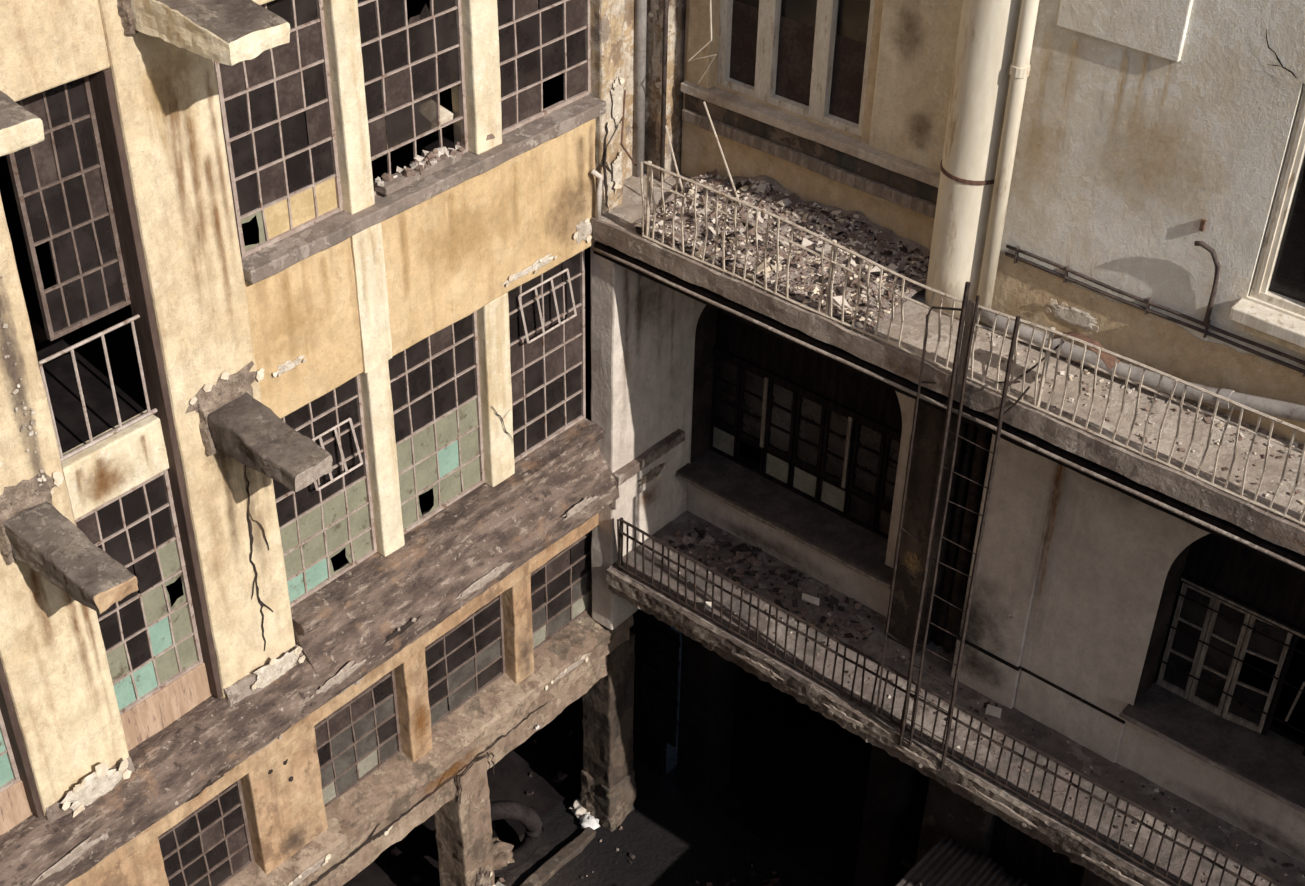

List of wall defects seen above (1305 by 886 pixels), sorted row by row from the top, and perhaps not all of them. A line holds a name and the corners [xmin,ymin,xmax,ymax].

flaking render [0,318,37,453]
spalling [185,355,306,414]
spalling [0,469,64,511]
crack [245,466,273,651]
spalling [252,646,306,690]
spalling [60,758,132,818]